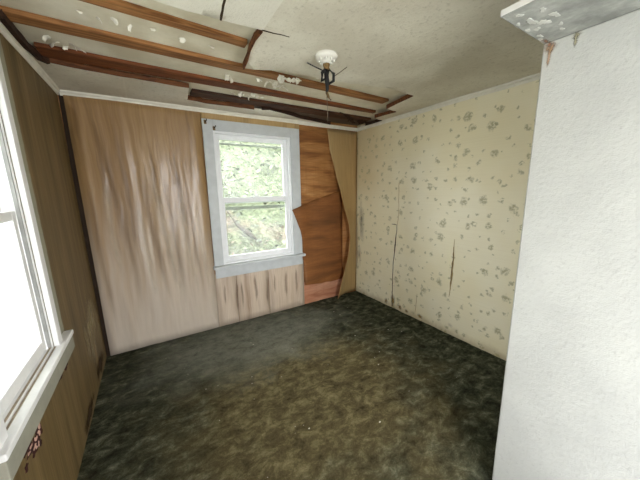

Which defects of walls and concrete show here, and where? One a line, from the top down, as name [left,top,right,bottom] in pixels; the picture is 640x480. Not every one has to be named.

peeling [42,35,86,53]
peeling [256,75,301,91]
peeling [327,129,357,298]
crack [391,200,399,306]
crack [448,239,456,295]
peeling [24,423,43,473]